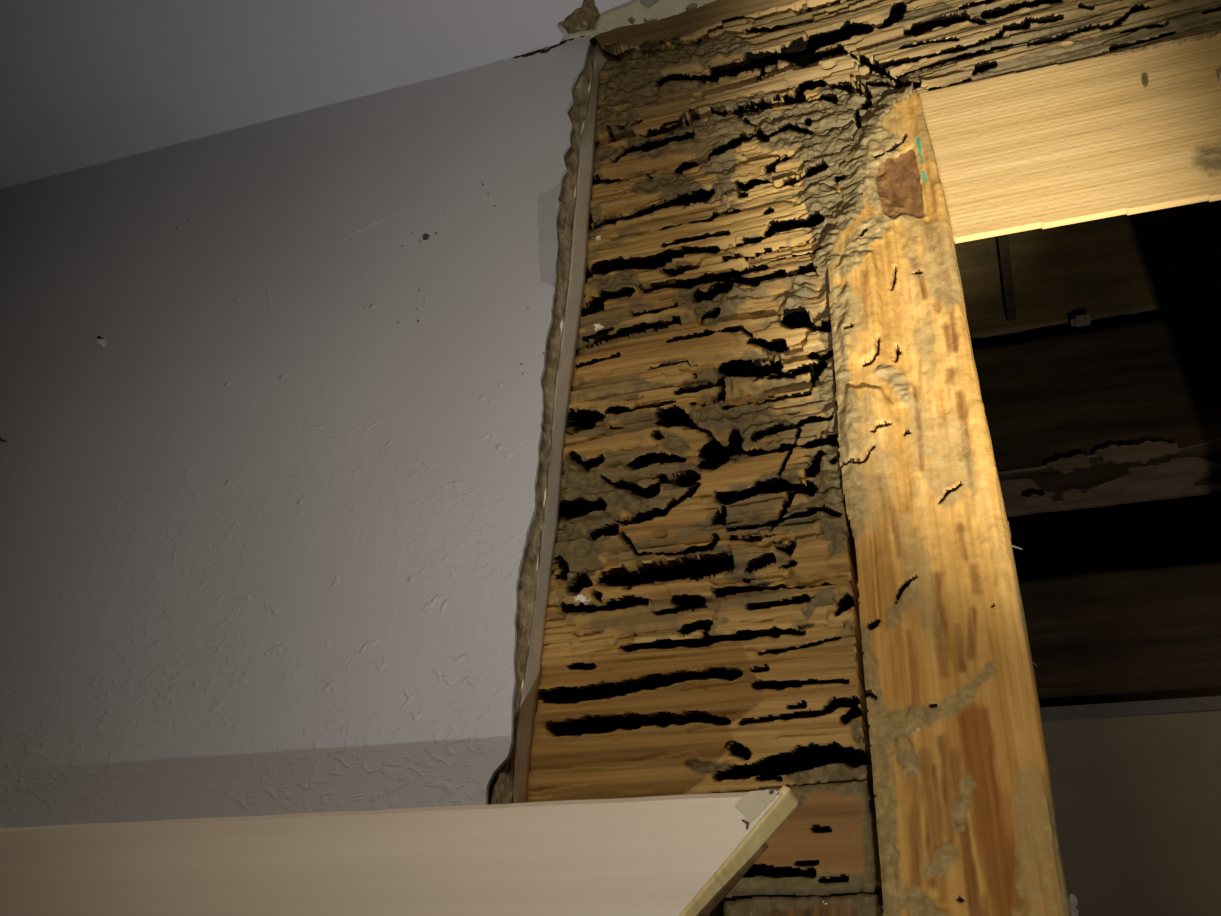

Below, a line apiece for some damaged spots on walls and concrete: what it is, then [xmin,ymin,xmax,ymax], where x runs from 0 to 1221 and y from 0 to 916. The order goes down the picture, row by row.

spalling [558,0,600,34]
peeling [594,33,873,167]
peeling [537,180,563,286]
peeling [581,269,643,317]
spalling [693,279,741,303]
spalling [718,275,834,406]
spalling [567,400,750,470]
spalling [778,428,802,477]
spalling [804,450,838,477]
peeling [616,489,659,518]
spalling [567,572,603,598]
peeling [723,550,855,620]